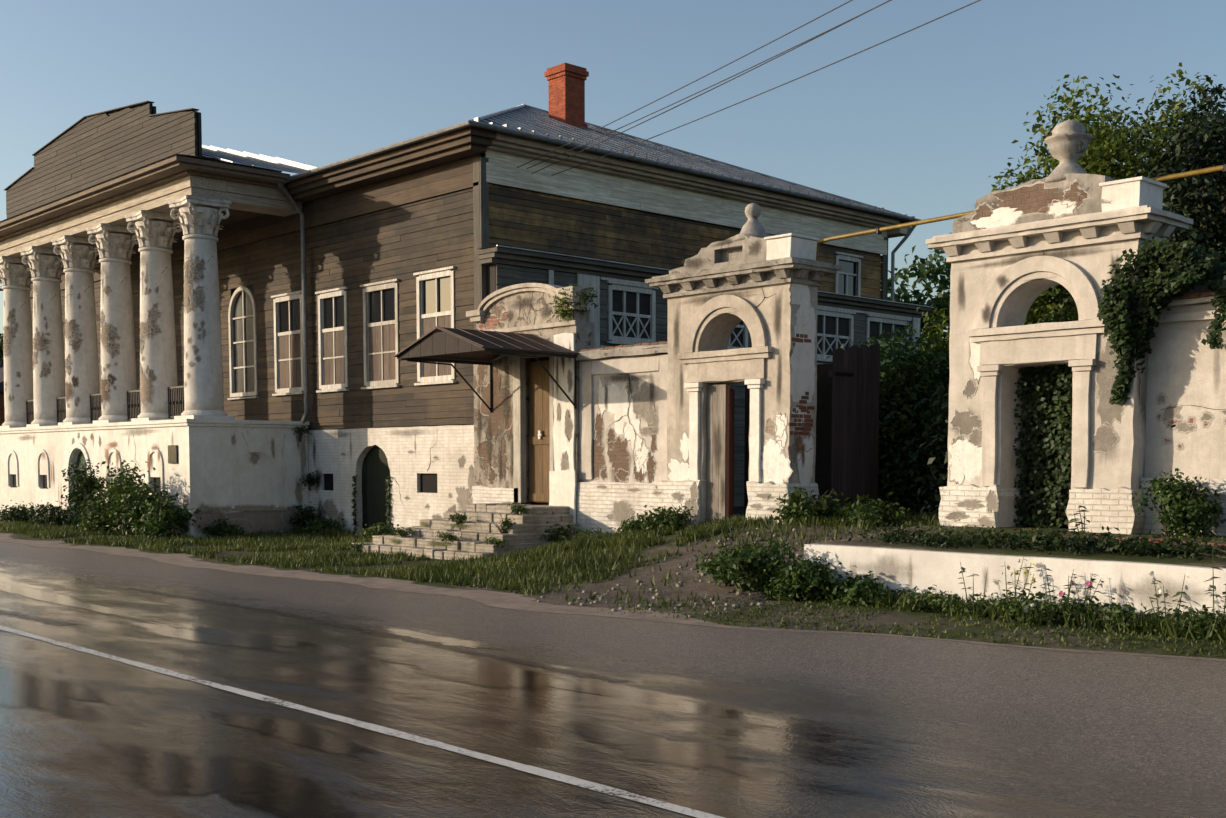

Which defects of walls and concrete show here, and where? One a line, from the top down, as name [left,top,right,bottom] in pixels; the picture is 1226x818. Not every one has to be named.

spalling [971,178,1090,229]
peeling [3,284,83,413]
peeling [100,311,122,410]
spalling [140,271,163,406]
peeling [184,255,207,387]
peeling [591,375,699,525]
peeling [750,283,815,513]
peeling [945,336,999,528]
peeling [1090,324,1226,454]